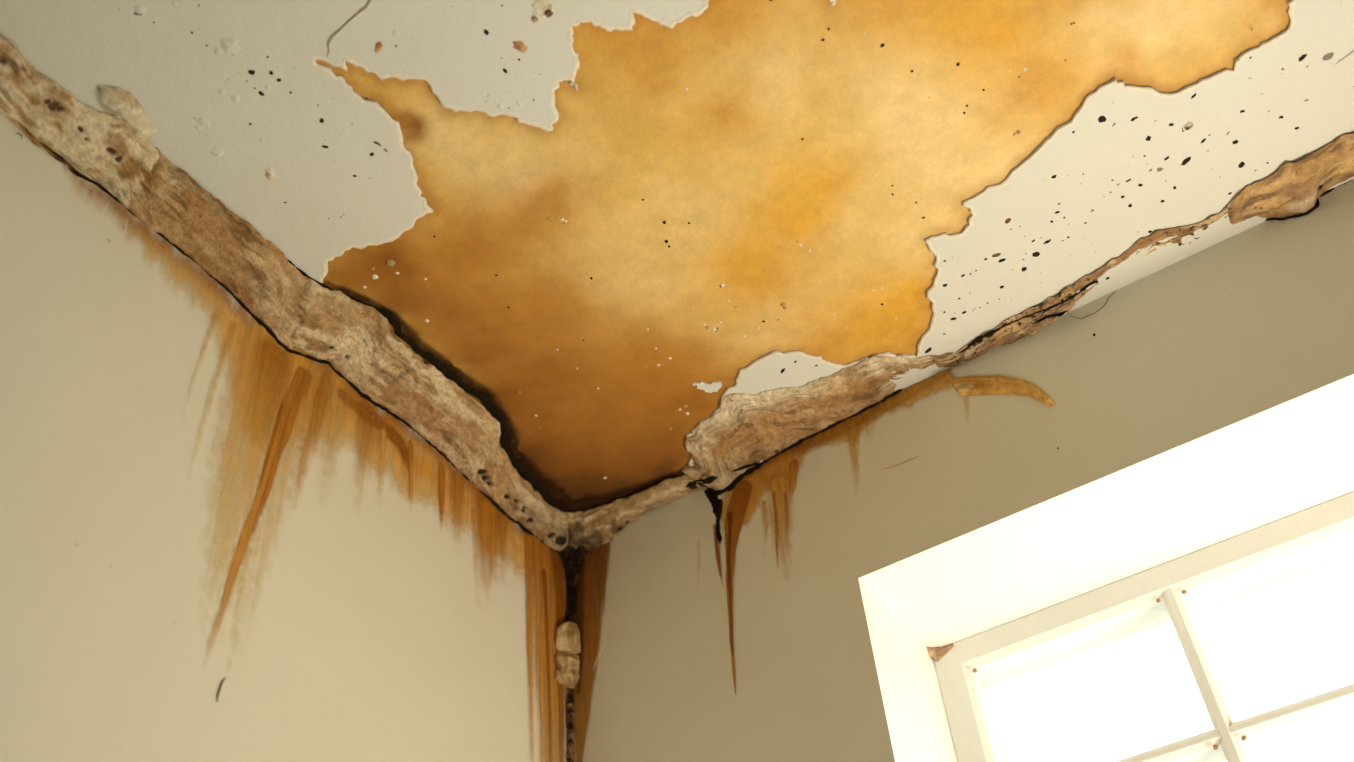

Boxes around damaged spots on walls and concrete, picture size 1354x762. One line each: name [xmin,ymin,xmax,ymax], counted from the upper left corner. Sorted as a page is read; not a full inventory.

crack [18,122,589,624]
damp [81,183,610,762]
crack [287,259,902,543]
spalling [0,34,1231,551]
damp [311,0,1298,512]
damp [713,369,953,693]
crack [957,277,1115,355]
crack [1265,179,1354,221]